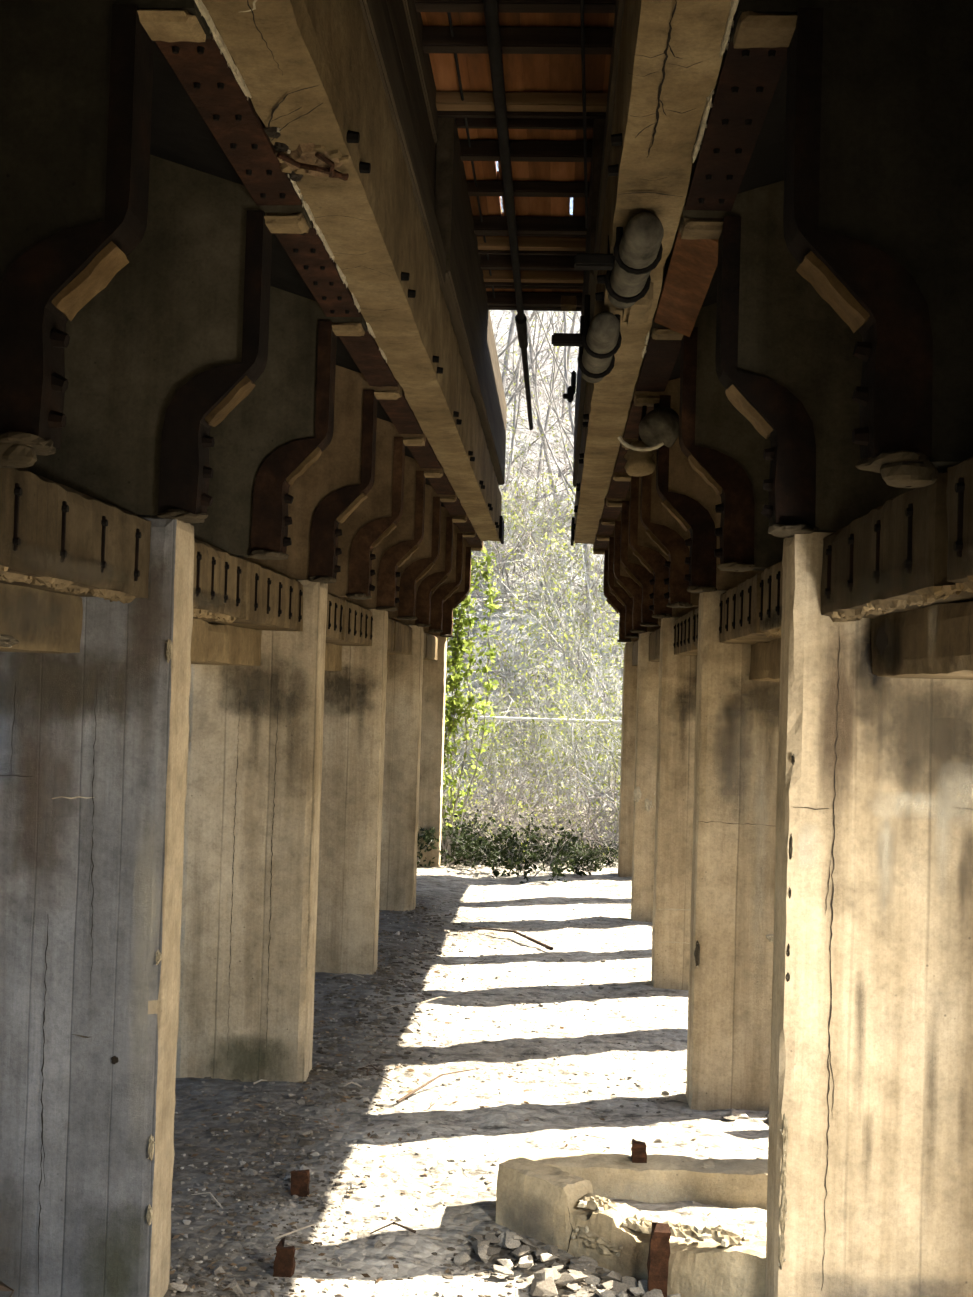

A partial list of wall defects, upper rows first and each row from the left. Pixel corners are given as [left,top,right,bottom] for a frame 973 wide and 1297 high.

crack [247,0,323,142]
crack [627,0,703,157]
peeling [720,0,739,58]
damp [0,593,127,711]
spalling [0,565,136,604]
damp [720,681,780,794]
damp [856,616,973,806]
crack [701,638,840,1291]
crack [38,927,48,1293]
spalling [577,1193,750,1247]